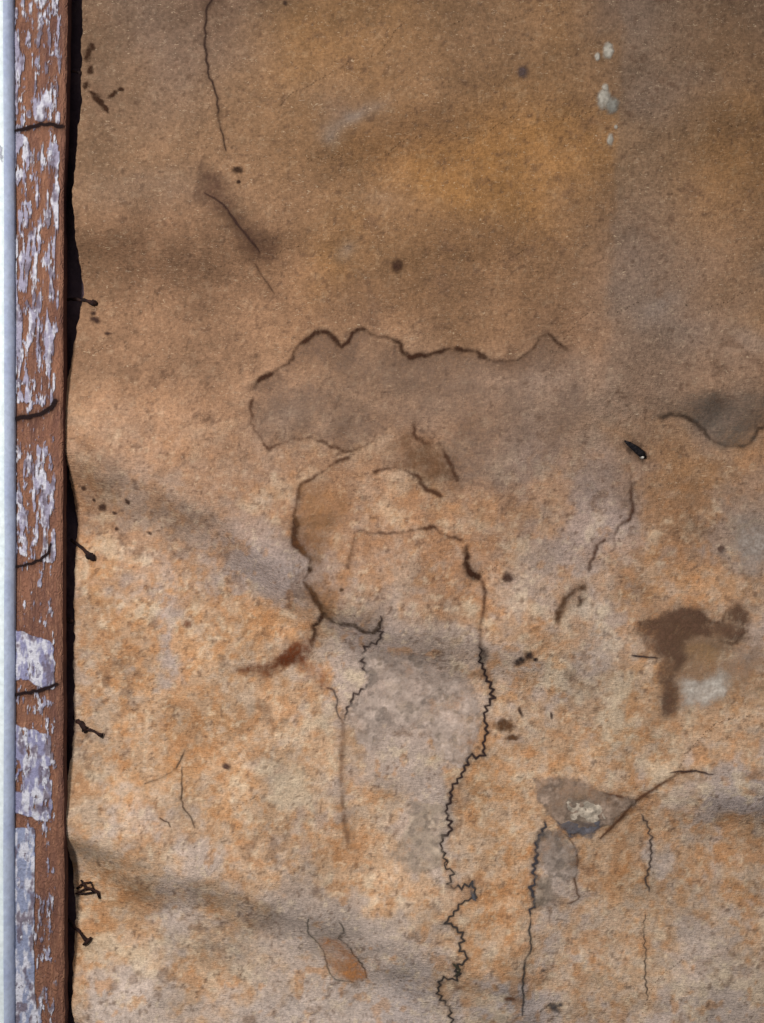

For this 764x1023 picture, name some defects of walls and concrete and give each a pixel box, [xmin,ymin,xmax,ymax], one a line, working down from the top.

crack [203,0,226,150]
crack [205,193,272,290]
leakage [661,401,741,445]
rust [263,643,307,676]
leakage [642,607,761,715]
crack [435,647,496,1023]
peeling [533,777,635,906]
crack [600,770,713,889]
crack [521,822,580,1015]
crack [641,920,649,992]